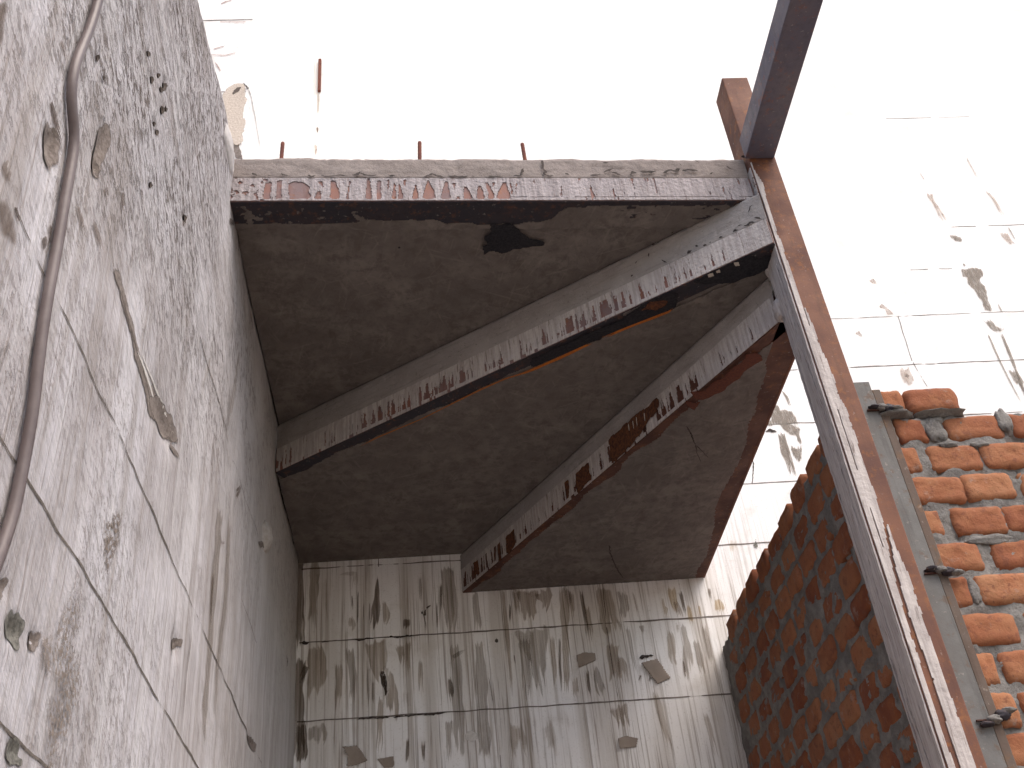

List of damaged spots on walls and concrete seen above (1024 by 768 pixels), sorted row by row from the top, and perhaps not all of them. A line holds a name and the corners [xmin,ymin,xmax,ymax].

spalling [43,122,61,170]
spalling [91,123,111,178]
spalling [223,83,247,159]
spalling [483,224,545,255]
spalling [530,293,678,367]
spalling [608,398,659,463]
spalling [564,462,592,498]
spalling [494,529,515,561]
peeling [5,579,82,768]